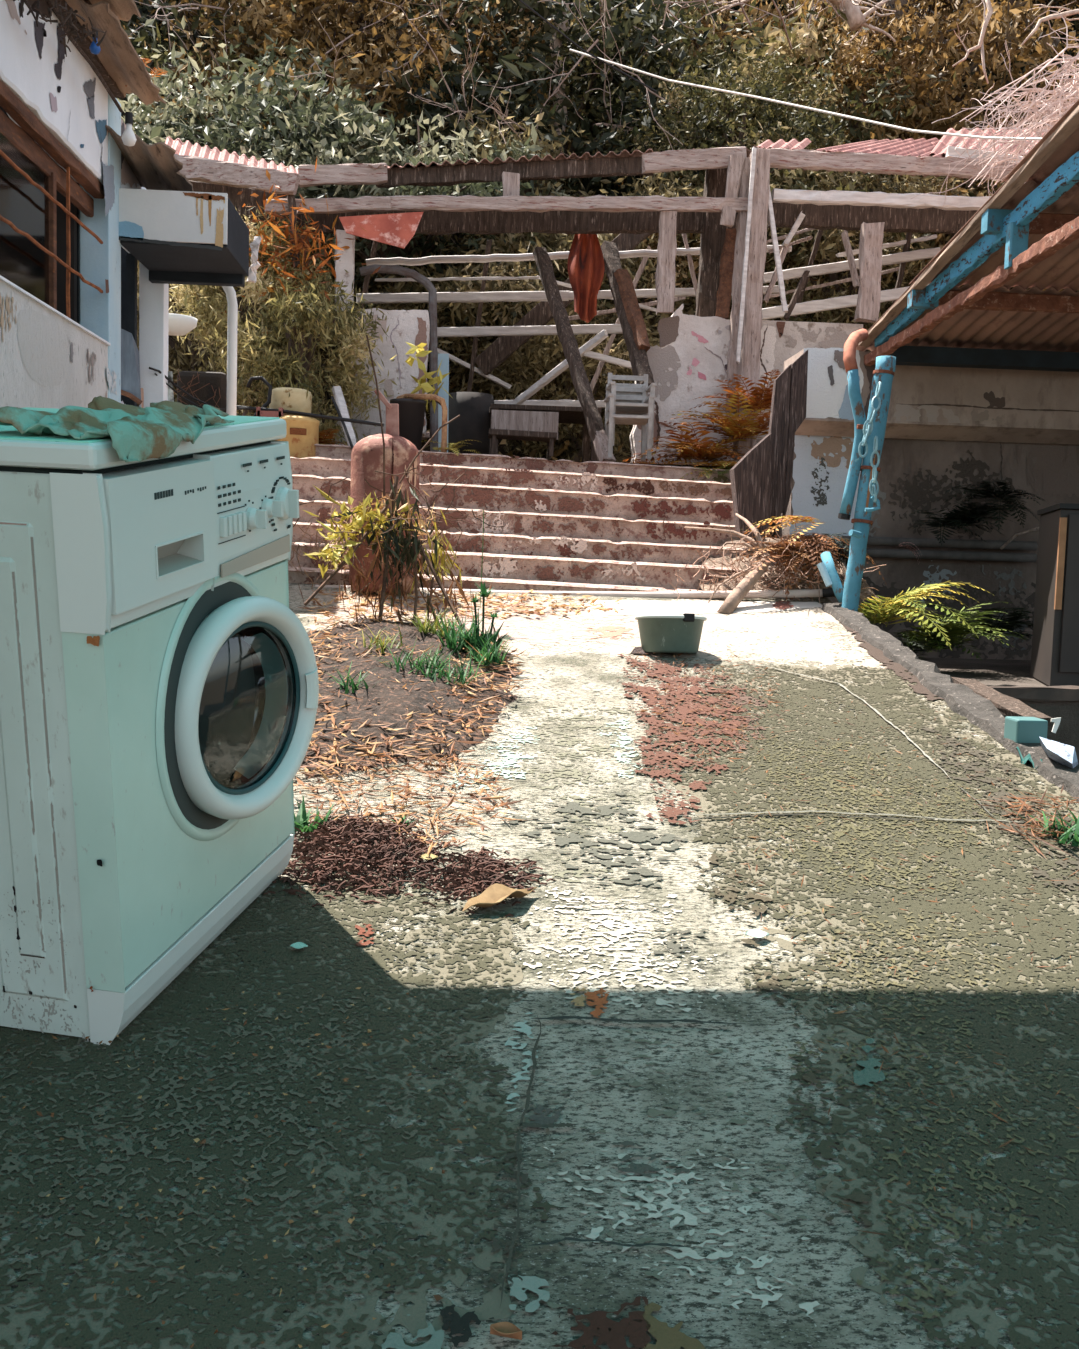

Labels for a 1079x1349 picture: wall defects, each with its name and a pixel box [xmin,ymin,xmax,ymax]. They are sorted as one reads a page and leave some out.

peeling [553,472,598,491]
leakage [888,442,1079,539]
peeling [472,510,589,578]
peeling [601,563,648,582]
peeling [297,589,894,674]